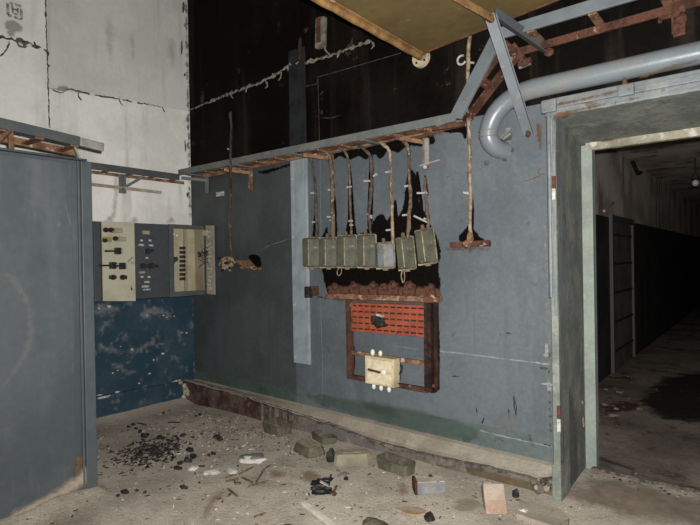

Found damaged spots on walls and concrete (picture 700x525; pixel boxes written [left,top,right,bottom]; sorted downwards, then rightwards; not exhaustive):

water stain [6,21,22,35]
crack [0,0,165,128]
corrosion [554,96,593,119]
spalling [249,254,261,267]
peeling [141,306,180,319]
water stain [601,374,700,422]